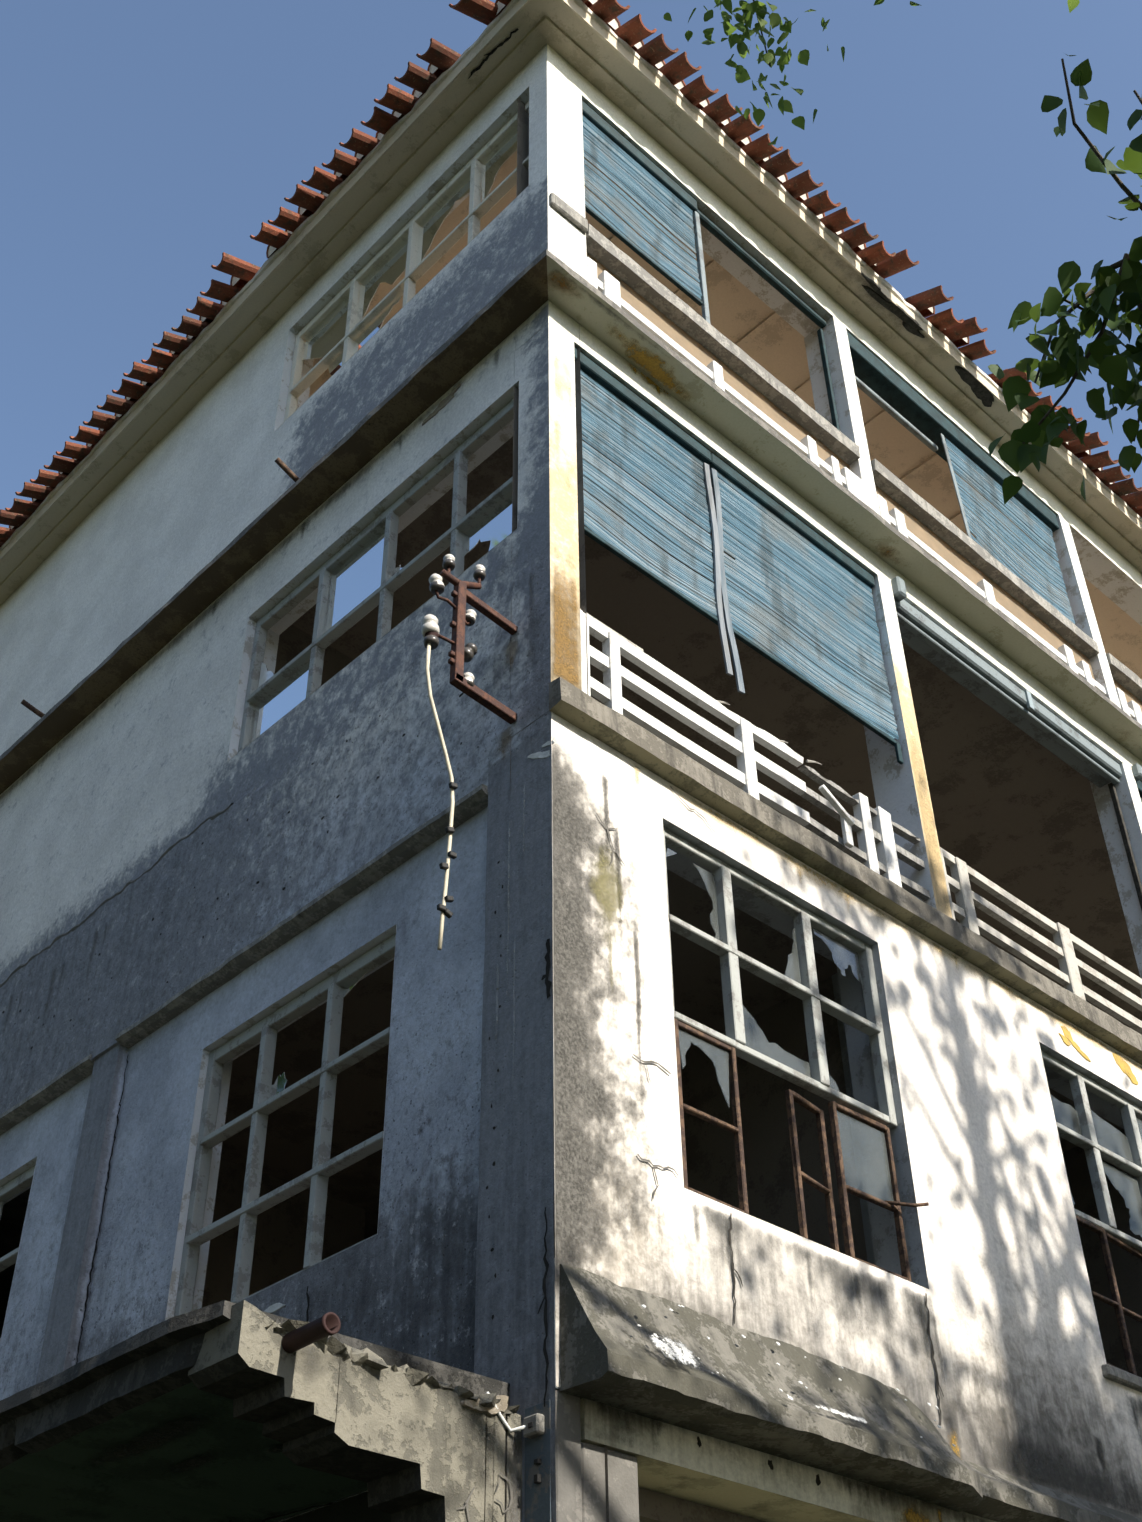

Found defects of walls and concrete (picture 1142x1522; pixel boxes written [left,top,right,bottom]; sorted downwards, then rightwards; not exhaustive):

water stain [552,744,649,1268]
crack [728,1213,743,1324]
peeling [637,1304,700,1367]
peeling [815,1405,867,1424]
water stain [994,1408,1142,1513]
water stain [1133,1400,1142,1425]